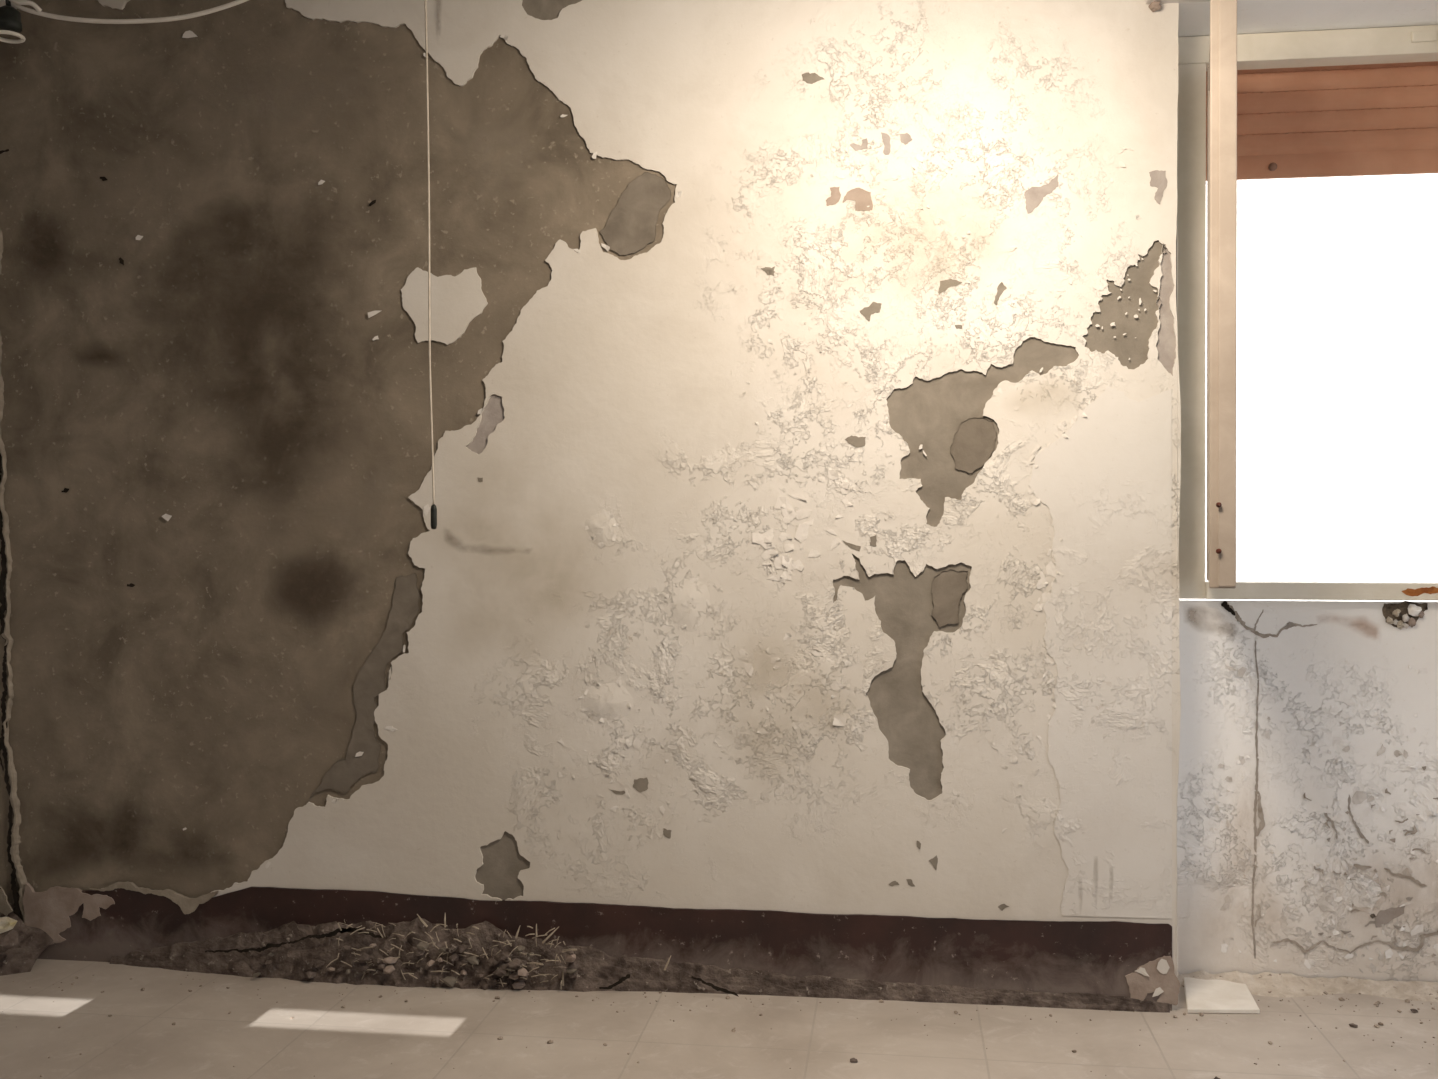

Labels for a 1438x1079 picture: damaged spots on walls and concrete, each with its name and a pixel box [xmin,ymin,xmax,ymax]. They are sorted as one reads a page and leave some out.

crack [0,229,8,274]
crack [0,332,27,923]
flaking render [0,0,682,945]
flaking render [738,470,972,800]
peeling [845,435,866,447]
flaking render [886,241,1176,527]
crack [1221,601,1438,959]